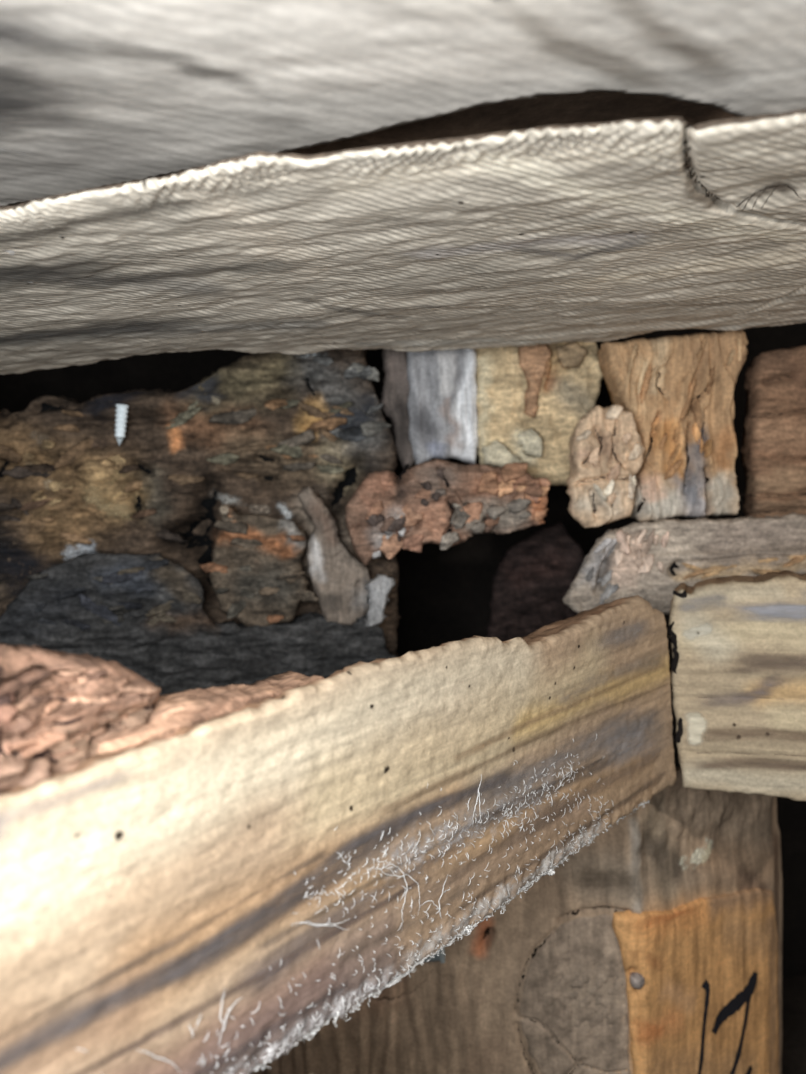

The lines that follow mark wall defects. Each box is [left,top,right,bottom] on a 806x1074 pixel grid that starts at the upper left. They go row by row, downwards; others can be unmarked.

crack [683,123,802,211]
damp [0,753,571,1074]
damp [531,822,600,879]
crack [515,906,628,1074]